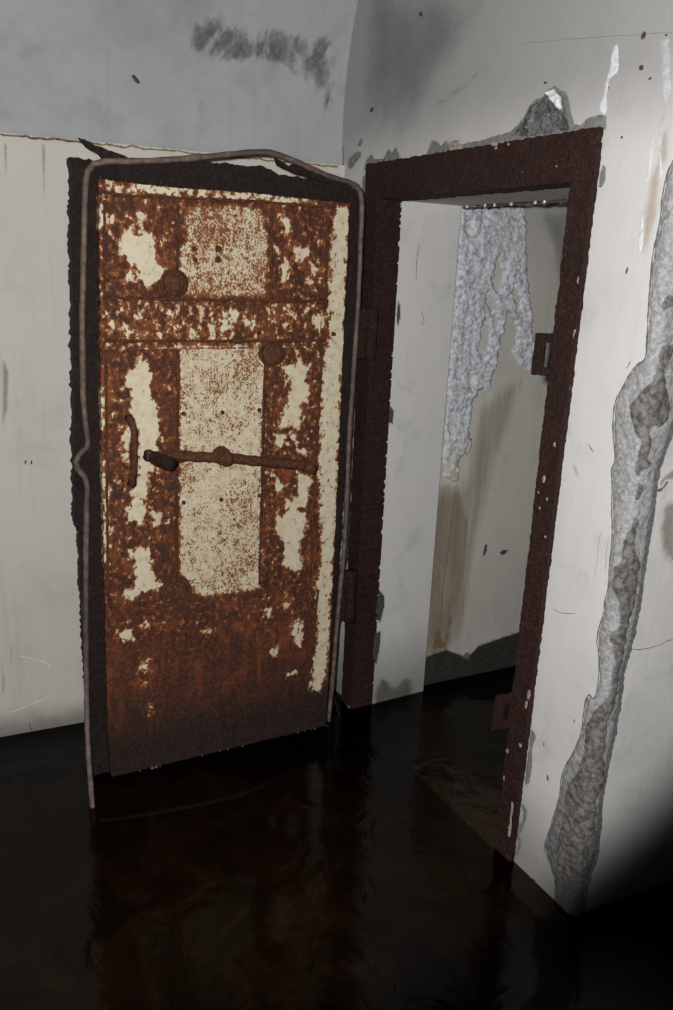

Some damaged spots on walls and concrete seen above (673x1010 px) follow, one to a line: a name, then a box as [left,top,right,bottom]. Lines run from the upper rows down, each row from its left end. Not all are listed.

leakage [197,23,298,60]
leakage [307,41,327,83]
spalling [427,82,607,154]
spalling [544,160,673,915]